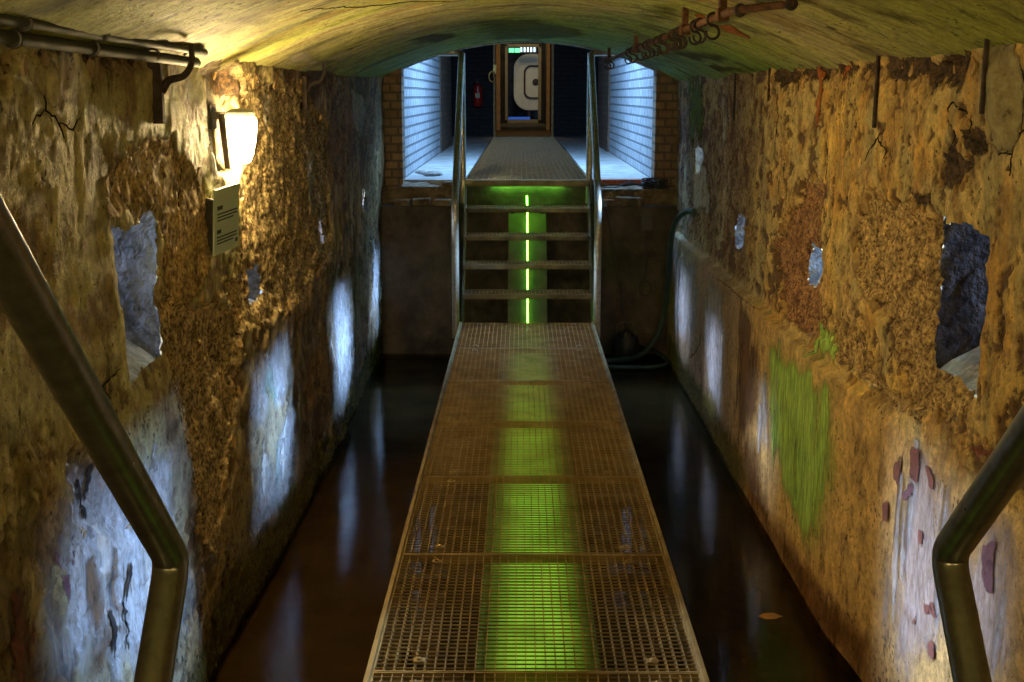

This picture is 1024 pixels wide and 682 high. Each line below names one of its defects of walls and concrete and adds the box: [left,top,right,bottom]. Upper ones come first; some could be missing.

crack [32,96,80,139]
crack [947,101,972,151]
crack [998,64,1024,176]
flaking render [772,127,989,429]
flaking render [104,59,332,563]
flaking render [64,463,130,538]
flaking render [893,447,933,500]
flaking render [55,551,75,599]
flaking render [981,539,996,593]
flaking render [109,562,133,660]
flaking render [912,602,936,624]